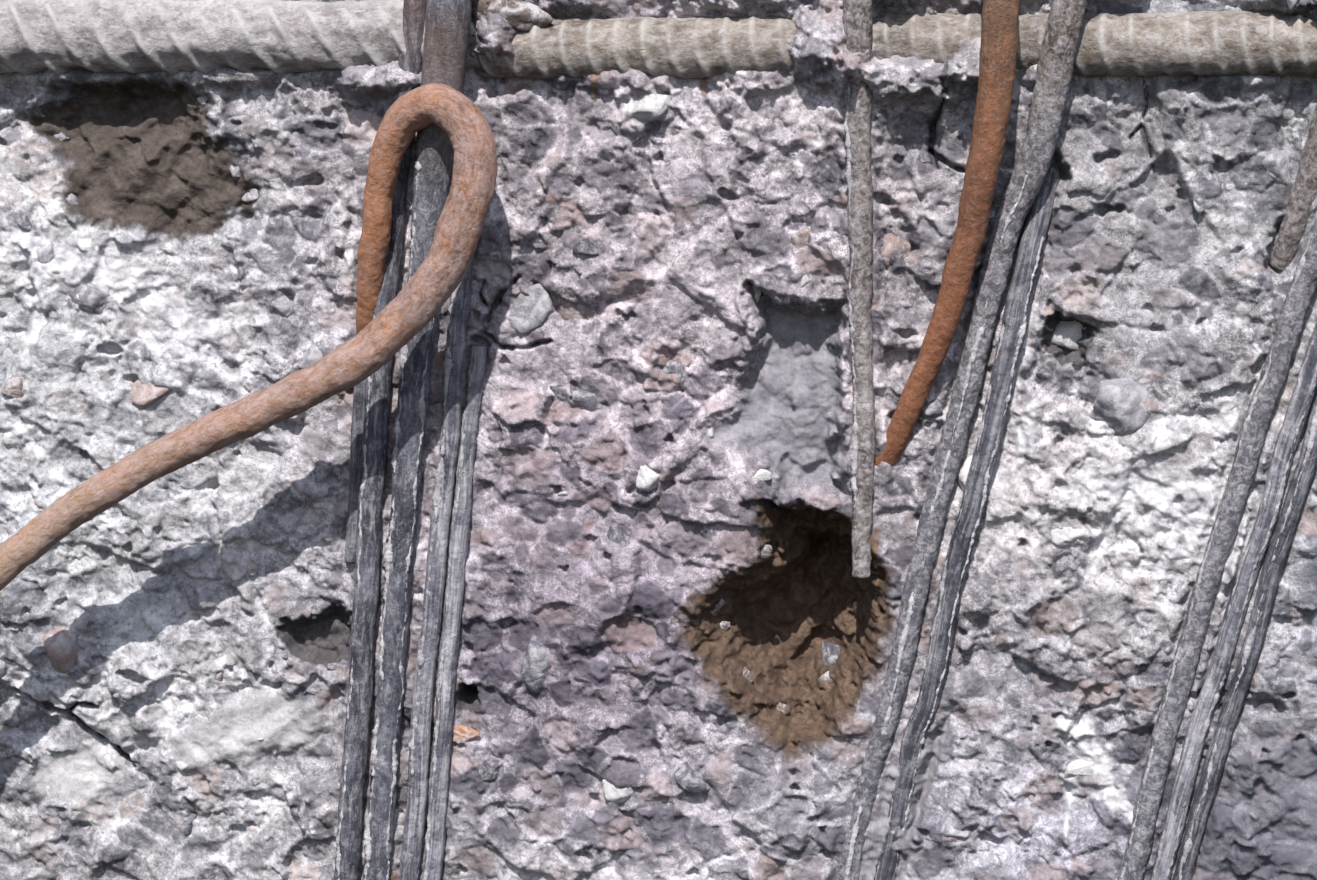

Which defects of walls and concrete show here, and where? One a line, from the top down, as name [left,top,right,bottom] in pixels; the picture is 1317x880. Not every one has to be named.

spalling [466,15,798,79]
spalling [872,11,982,63]
spalling [1016,13,1049,70]
spalling [1073,11,1317,77]
spalling [0,0,425,242]
spalling [707,285,841,490]
crack [42,701,133,762]
spalling [176,695,319,771]
spalling [37,750,120,800]